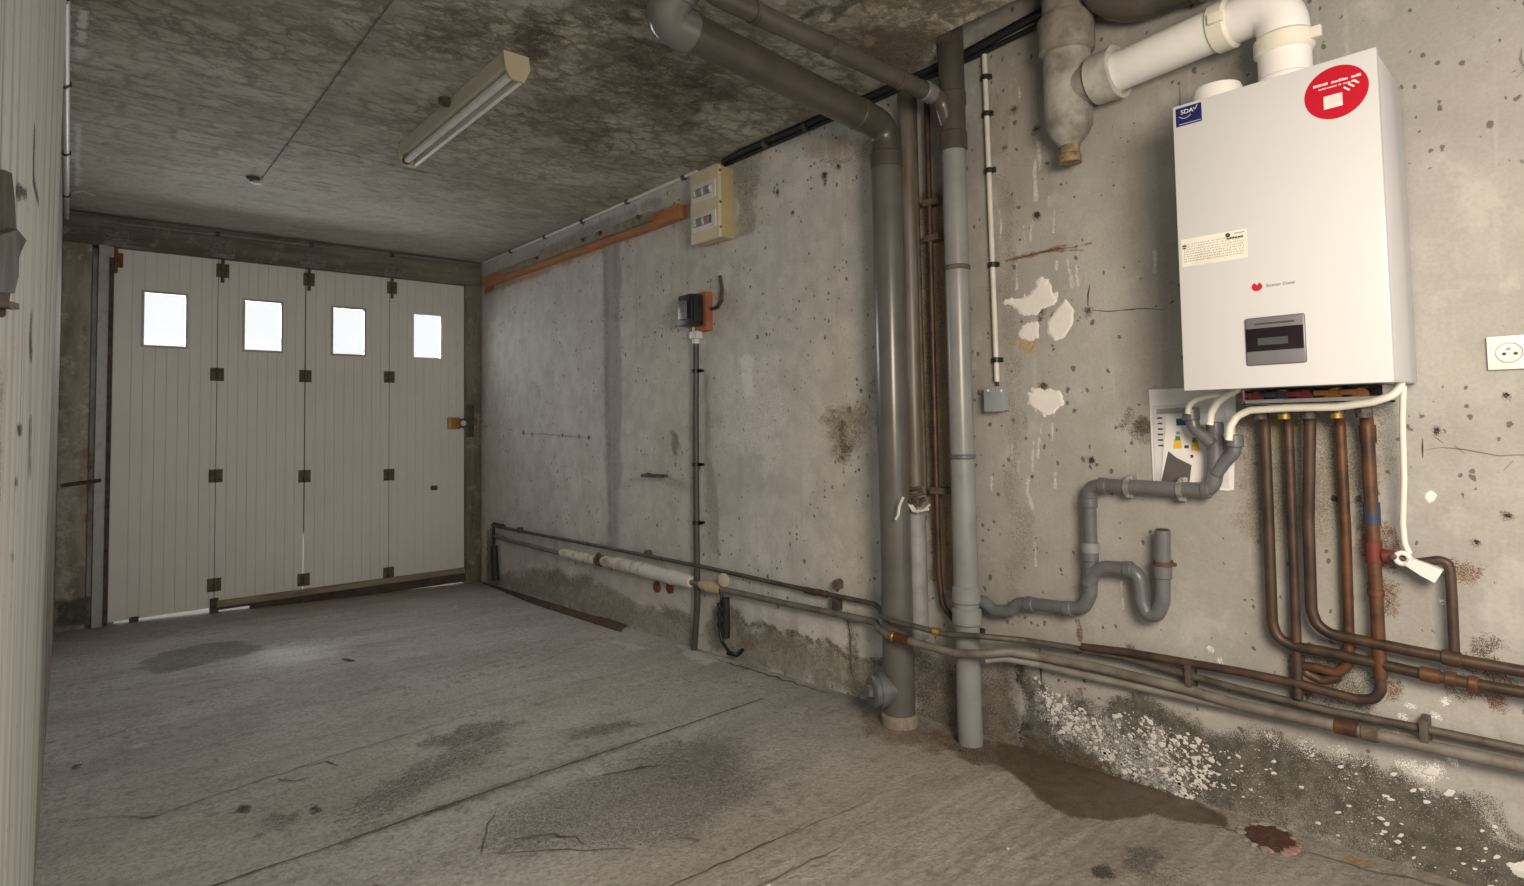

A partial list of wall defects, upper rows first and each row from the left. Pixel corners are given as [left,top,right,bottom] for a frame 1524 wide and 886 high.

water stain [391,0,750,156]
water stain [818,368,877,467]
water stain [133,641,266,675]
crack [211,610,869,886]
water stain [485,527,1524,886]